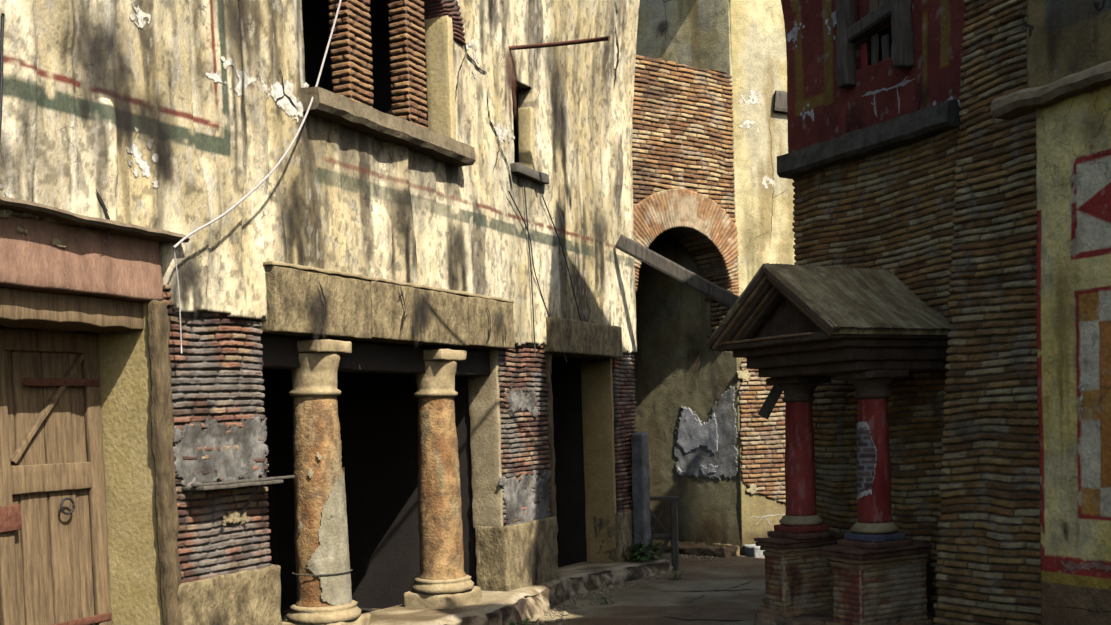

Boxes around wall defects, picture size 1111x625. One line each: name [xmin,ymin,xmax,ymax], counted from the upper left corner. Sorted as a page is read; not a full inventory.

leakage [227,0,242,47]
peeling [787,21,805,50]
peeling [825,11,837,40]
leakage [83,27,172,179]
leakage [233,71,247,141]
leakage [173,258,201,314]
leakage [284,186,305,265]
leakage [392,193,417,283]
leakage [450,230,466,292]
flaking render [673,358,786,504]
flaking render [856,422,877,500]